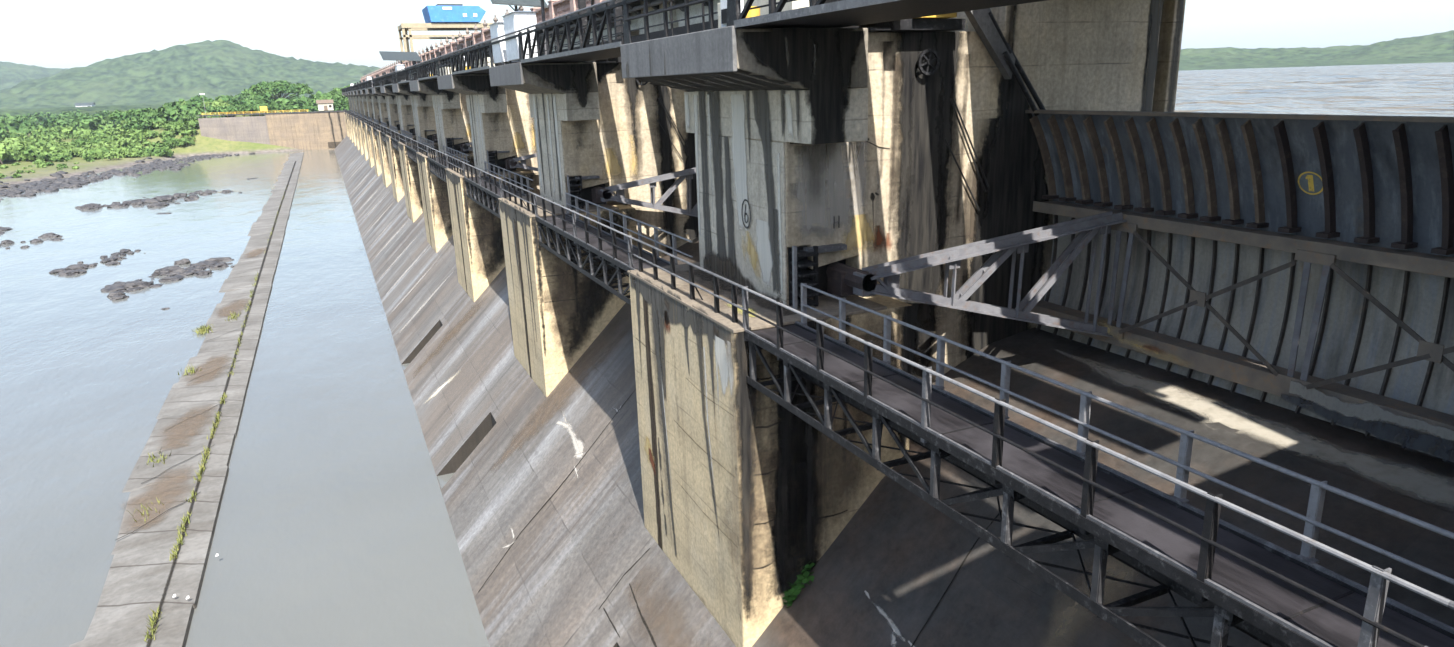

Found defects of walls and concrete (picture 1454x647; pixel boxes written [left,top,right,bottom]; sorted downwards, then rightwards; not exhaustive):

water stain [1006,5,1017,50]
water stain [416,28,1053,618]